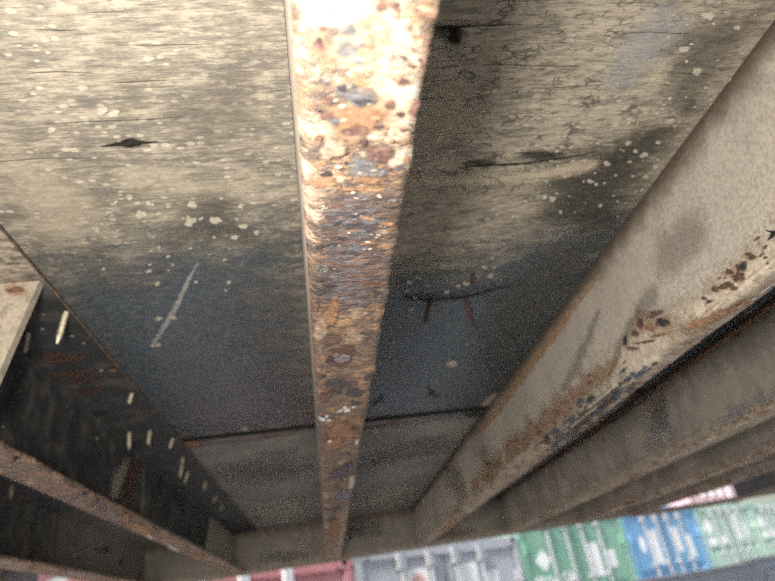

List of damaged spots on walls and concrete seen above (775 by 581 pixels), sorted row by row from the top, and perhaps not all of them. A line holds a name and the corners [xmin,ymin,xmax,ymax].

corrosion [391,36,430,85]
crack [423,20,518,100]
water stain [679,43,701,76]
crack [47,116,186,147]
water stain [48,234,313,439]
water stain [183,201,221,227]
corrosion [307,84,420,367]
crack [405,273,520,325]
crack [402,133,594,216]
water stain [363,97,676,433]
corrosion [622,245,769,351]
corrosion [317,374,371,451]